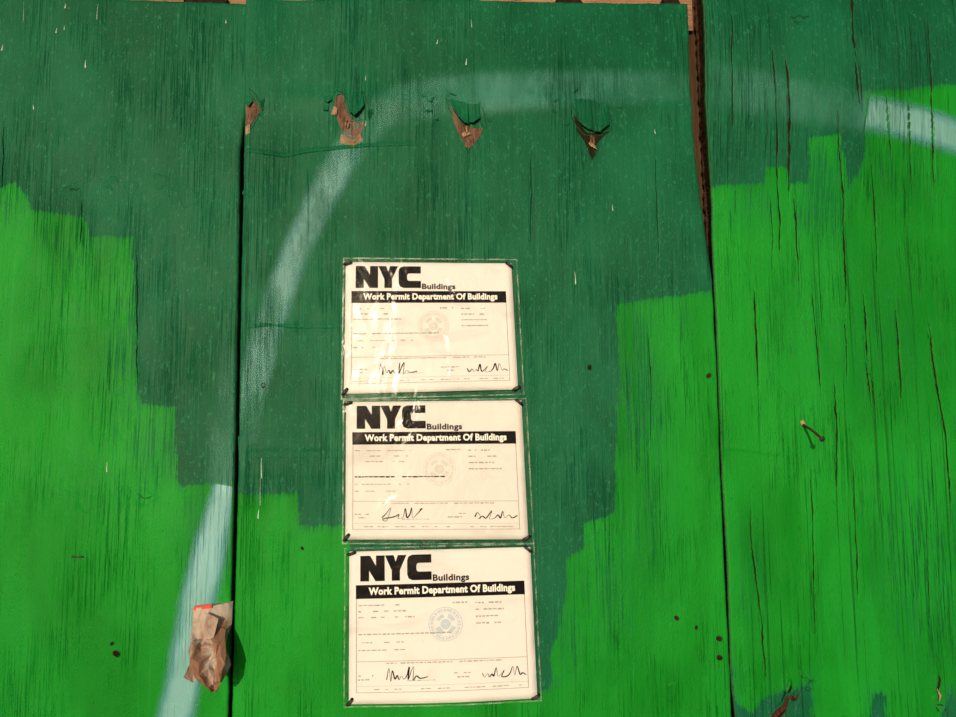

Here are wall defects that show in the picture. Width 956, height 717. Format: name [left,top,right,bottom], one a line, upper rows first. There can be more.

peeling [245,88,266,134]
peeling [323,90,373,145]
peeling [421,91,492,153]
peeling [564,88,621,160]
crack [728,4,736,140]
crack [752,0,937,651]
crack [925,305,953,524]
crack [748,490,805,717]